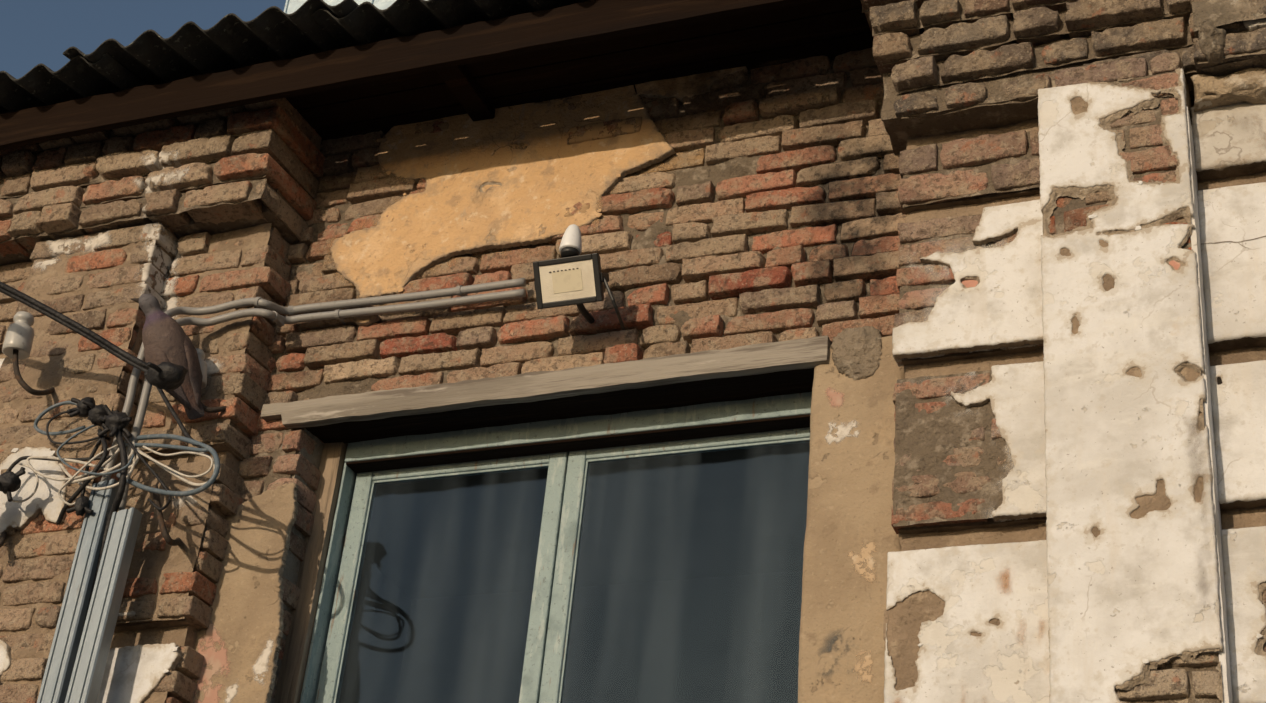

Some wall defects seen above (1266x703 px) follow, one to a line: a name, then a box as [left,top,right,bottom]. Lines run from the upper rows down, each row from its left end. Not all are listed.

spalling [1043,52,1182,185]
flaking render [330,58,788,298]
spalling [1042,184,1193,270]
crack [1203,236,1266,248]
flaking render [353,315,380,326]
flaking render [0,447,69,536]
peeling [1130,479,1171,519]
spalling [1258,582,1266,608]
flaking render [0,639,12,683]
peeling [883,590,945,690]
spalling [1115,648,1223,703]
spalling [1255,628,1266,656]